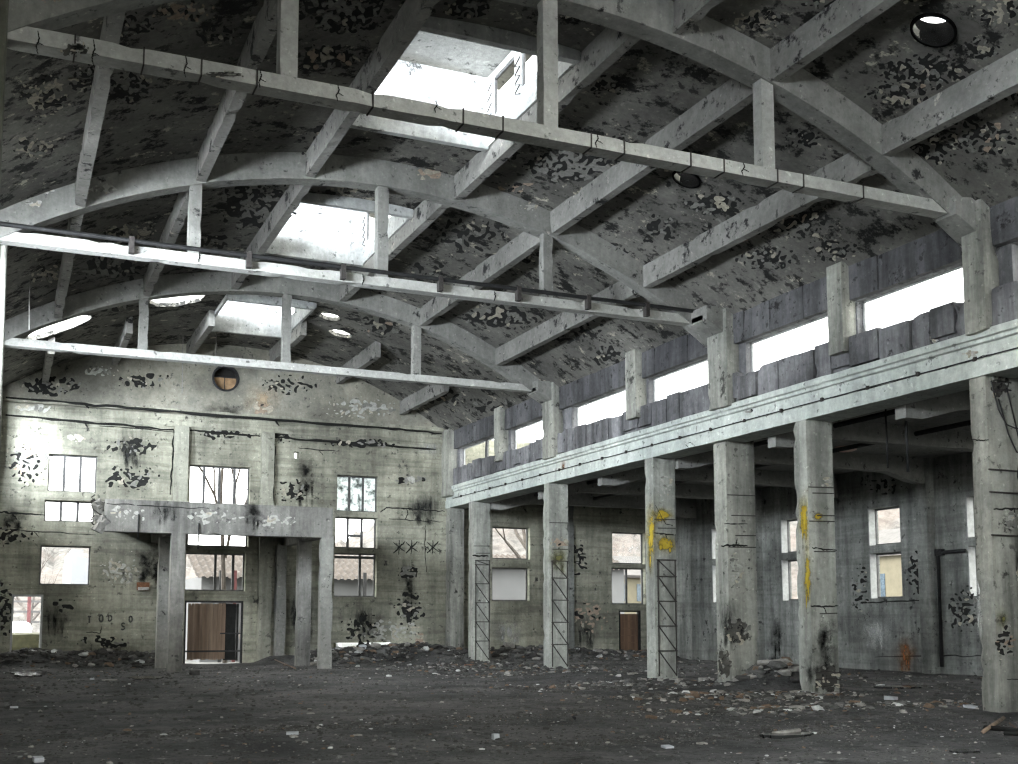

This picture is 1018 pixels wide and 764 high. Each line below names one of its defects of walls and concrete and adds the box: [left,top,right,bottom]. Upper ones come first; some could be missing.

damp [124,443,137,465]
spalling [716,616,751,679]